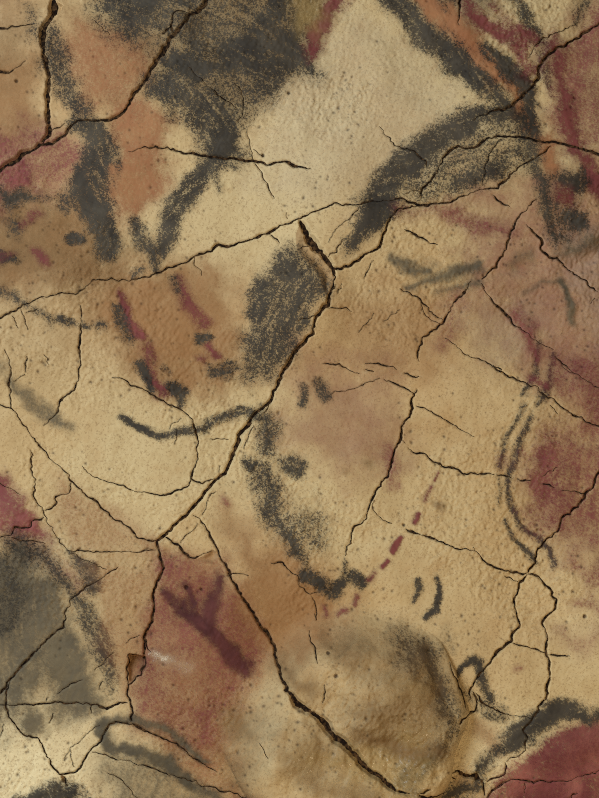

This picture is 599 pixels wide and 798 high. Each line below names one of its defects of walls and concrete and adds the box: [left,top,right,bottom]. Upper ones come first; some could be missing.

crack [0,0,208,173]
crack [128,67,310,197]
crack [379,126,427,168]
crack [420,135,599,199]
crack [474,21,599,120]
crack [401,199,599,388]
crack [445,338,599,427]
crack [0,146,550,798]
crack [324,363,599,798]